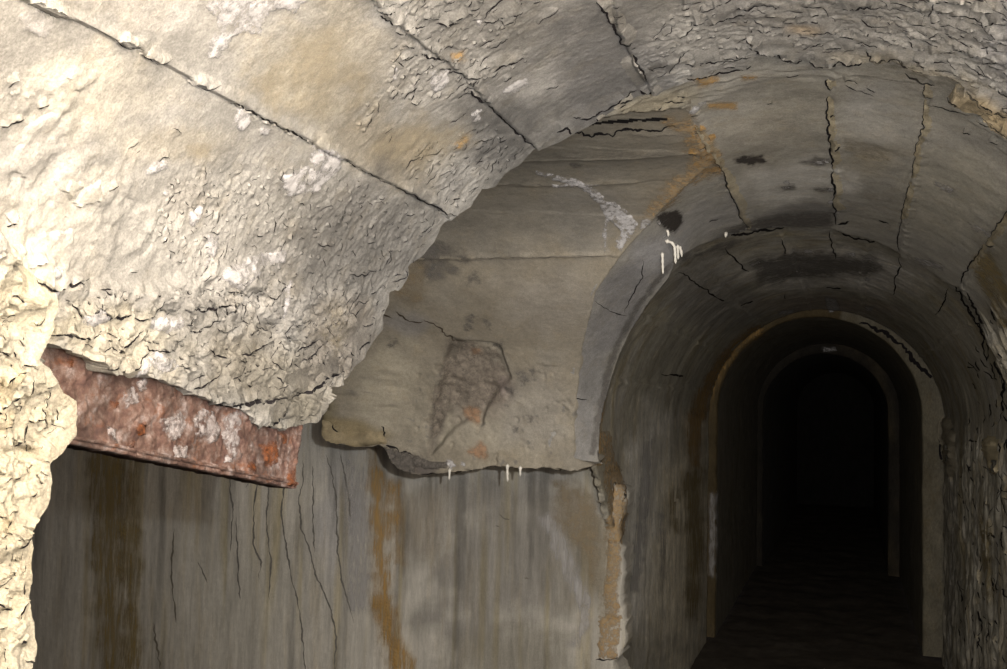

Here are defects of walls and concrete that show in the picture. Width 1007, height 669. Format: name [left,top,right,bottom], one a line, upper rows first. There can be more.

crack [28,0,72,18]
crack [116,31,173,65]
spalling [646,0,1007,139]
spalling [33,0,558,404]
crack [187,73,461,216]
leakage [536,170,682,251]
crack [469,0,1007,295]
leakage [736,155,765,165]
spalling [0,308,68,497]
spalling [0,493,40,629]
leakage [88,453,141,669]
corrosion [371,458,414,669]